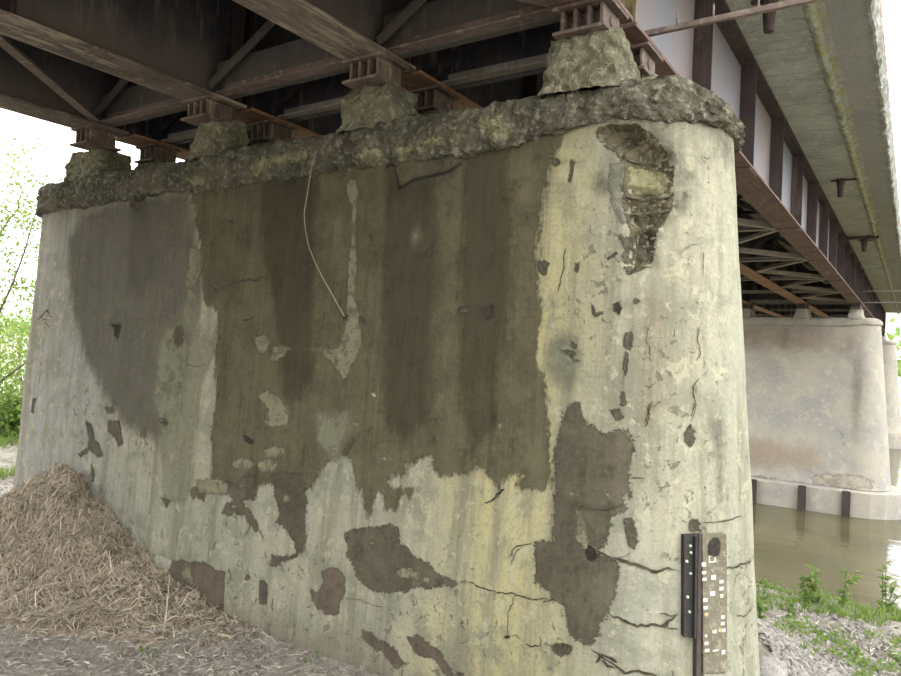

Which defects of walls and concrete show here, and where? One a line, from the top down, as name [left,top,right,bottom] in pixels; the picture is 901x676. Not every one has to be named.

spalling [596,123,675,275]
damp [69,112,635,646]
peeling [149,554,226,613]
peeling [310,523,465,616]
crack [509,543,531,563]
peeling [624,518,639,549]
crack [593,549,677,574]
crack [464,581,553,648]
crack [610,613,678,629]
peeling [362,630,409,669]
peeling [407,633,464,676]
crack [589,648,657,676]